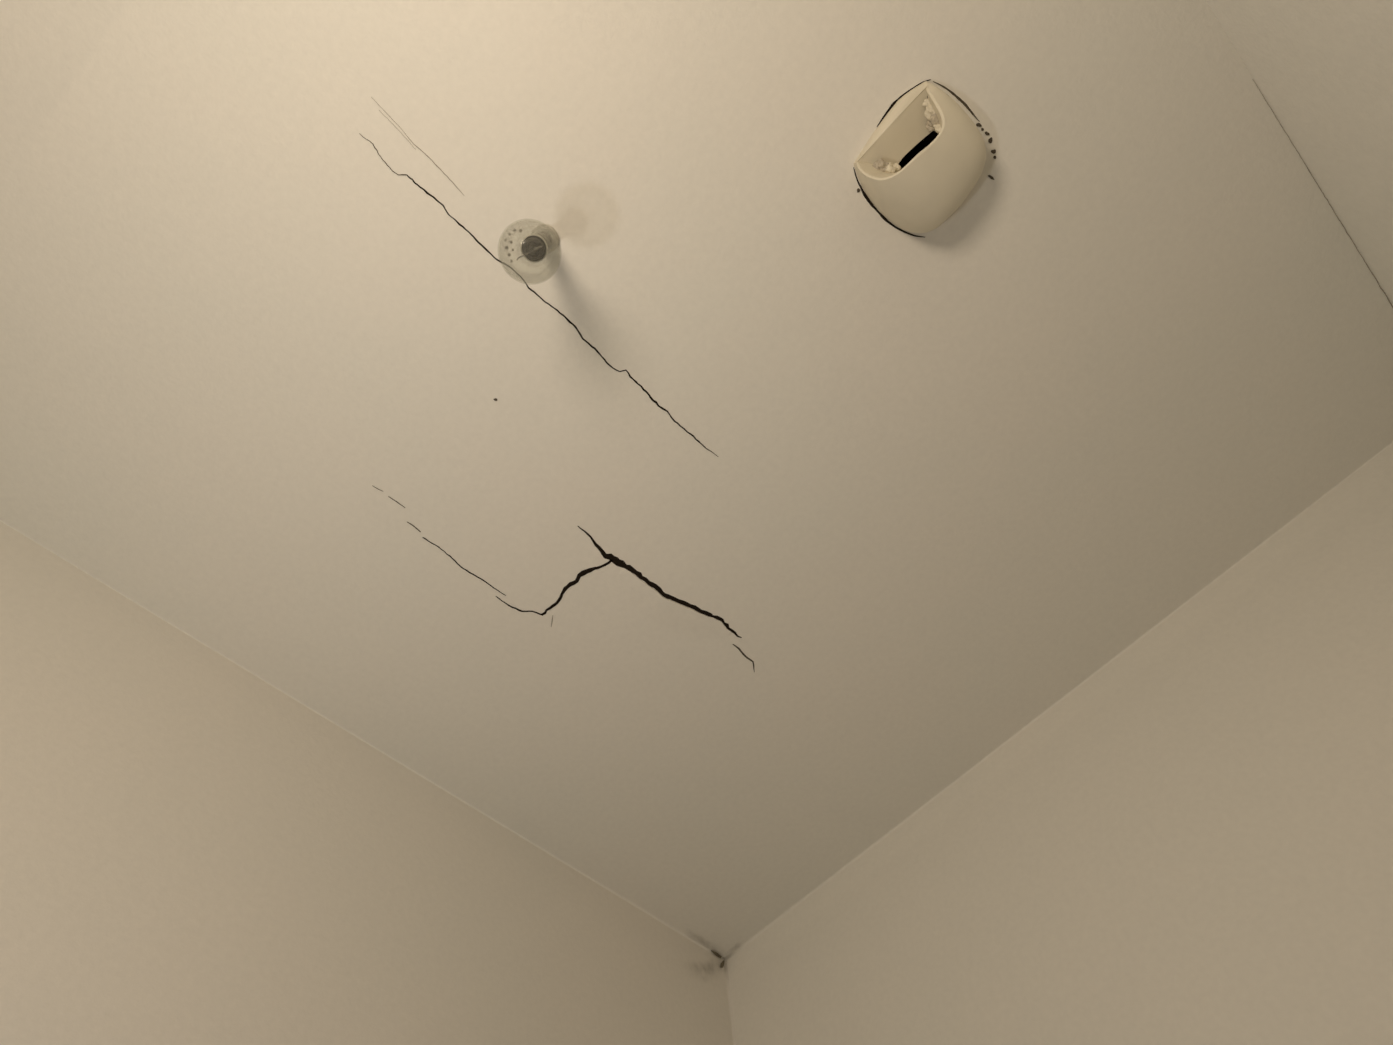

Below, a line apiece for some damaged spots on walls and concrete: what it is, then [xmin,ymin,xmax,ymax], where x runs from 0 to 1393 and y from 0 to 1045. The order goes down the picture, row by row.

crack [359,98,718,457]
crack [372,485,755,672]